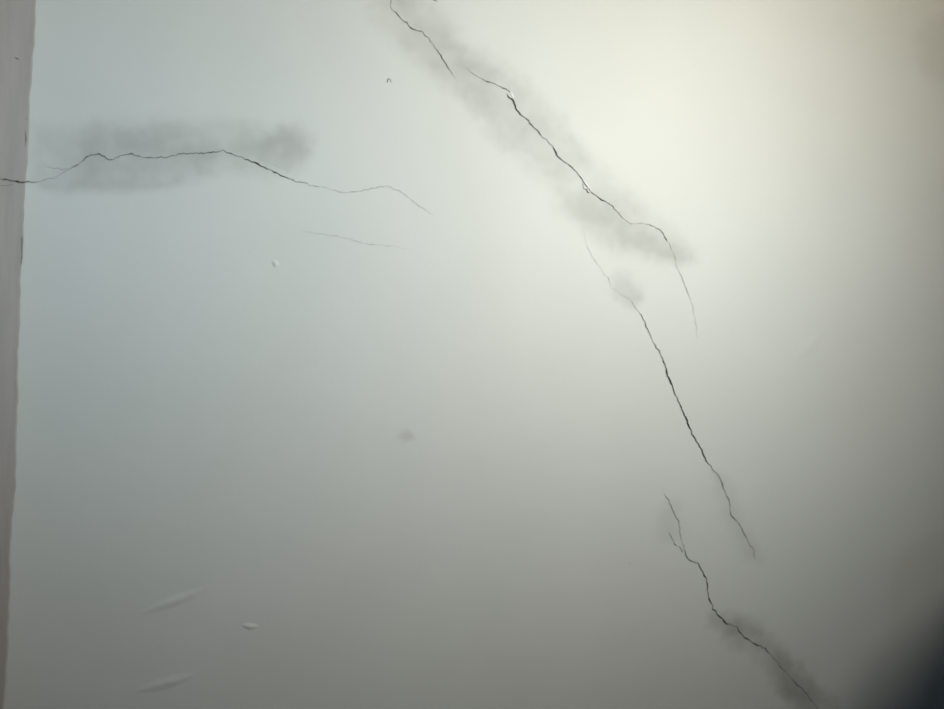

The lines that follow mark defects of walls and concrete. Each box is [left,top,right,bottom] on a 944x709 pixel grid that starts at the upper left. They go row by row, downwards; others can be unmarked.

crack [486,81,614,208]
crack [640,314,723,485]
crack [675,544,727,624]